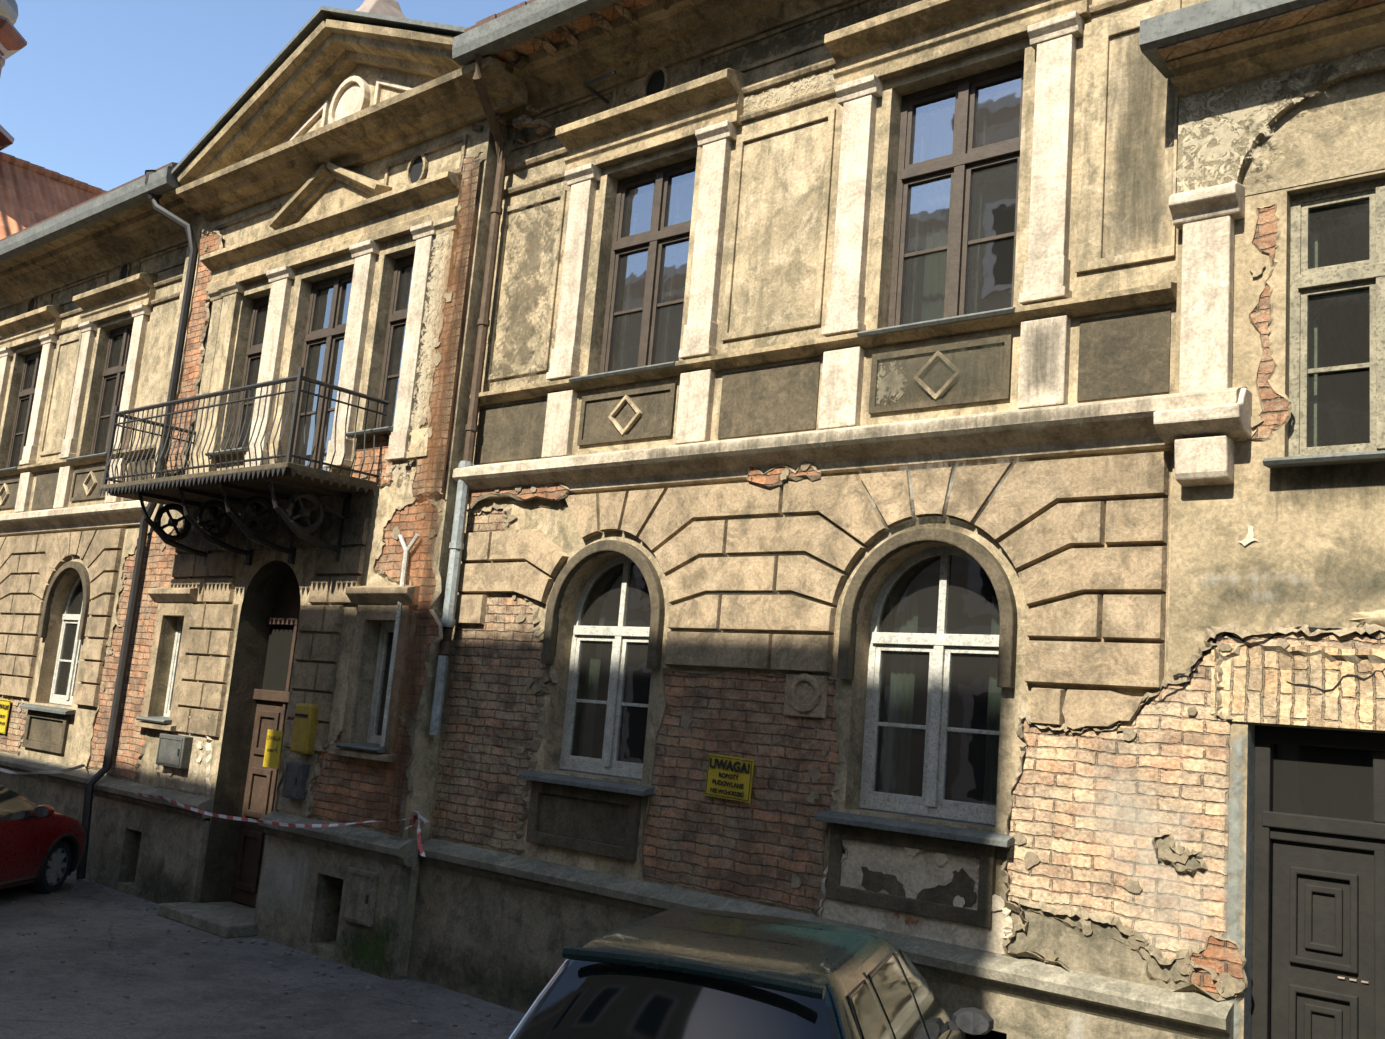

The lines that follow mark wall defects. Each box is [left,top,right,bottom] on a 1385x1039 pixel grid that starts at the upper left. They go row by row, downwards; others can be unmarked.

flaking render [275,152,570,856]
flaking render [639,622,1385,1001]
crack [1132,622,1385,726]
peeling [1249,203,1292,442]